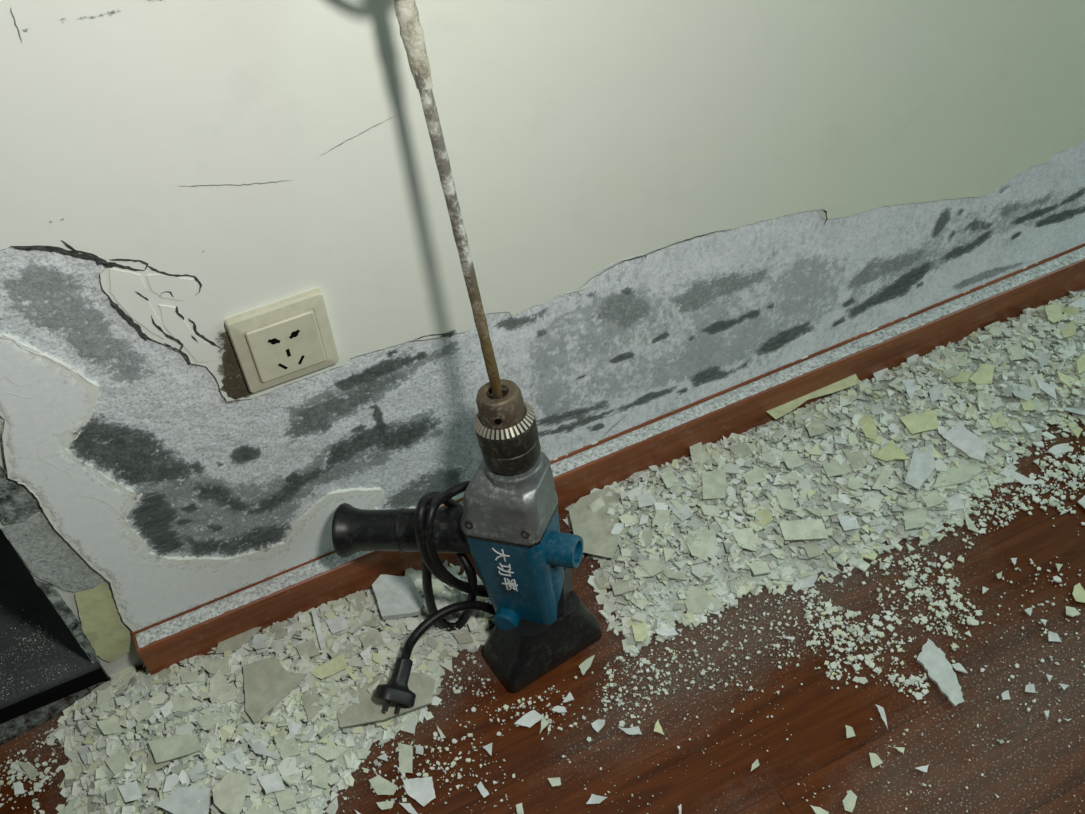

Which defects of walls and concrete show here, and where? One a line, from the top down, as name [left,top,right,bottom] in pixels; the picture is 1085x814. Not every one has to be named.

crack [10,240,221,364]
leakage [71,330,467,559]
peeling [0,140,1085,630]
leakage [496,186,1085,436]
spalling [34,576,101,663]